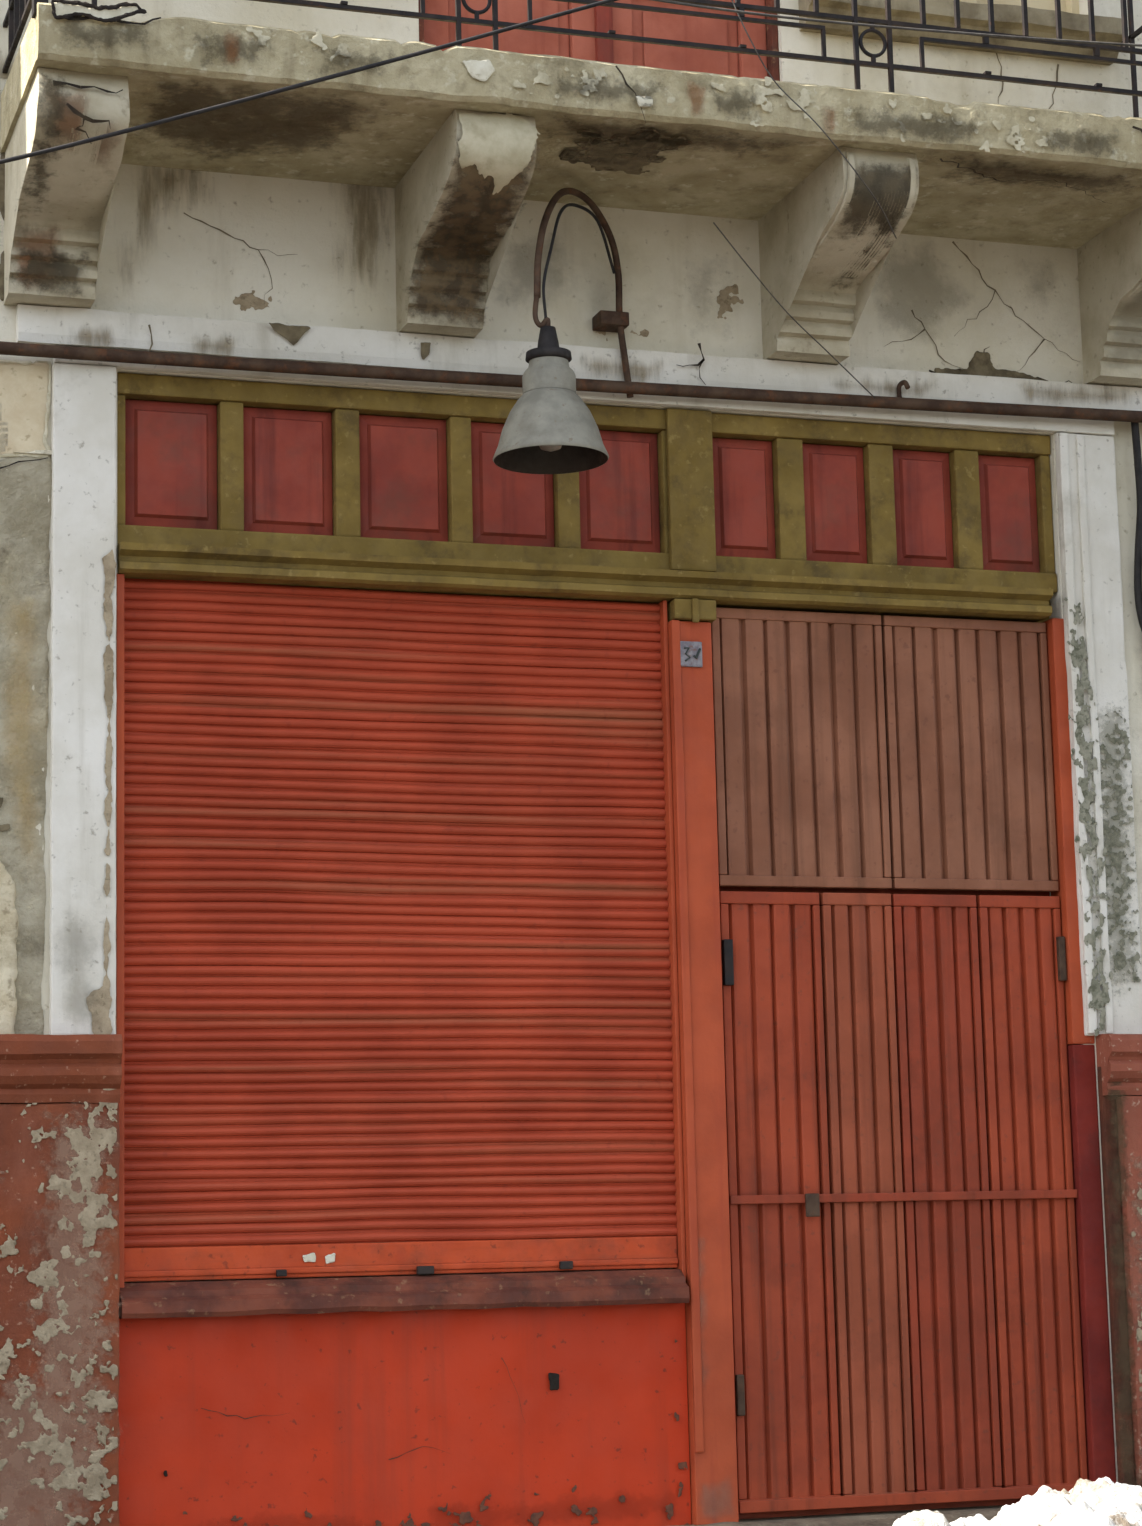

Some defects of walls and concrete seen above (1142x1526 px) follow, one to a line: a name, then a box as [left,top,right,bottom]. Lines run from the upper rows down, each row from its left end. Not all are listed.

water stain [24,75,65,202]
water stain [21,250,88,293]
water stain [150,85,366,157]
water stain [409,140,540,325]
water stain [564,121,786,153]
water stain [836,164,911,287]
crack [885,241,1079,383]
water stain [959,158,1134,192]
flaking render [0,359,52,1035]
water stain [1090,710,1141,991]
peeling [0,1089,119,1526]